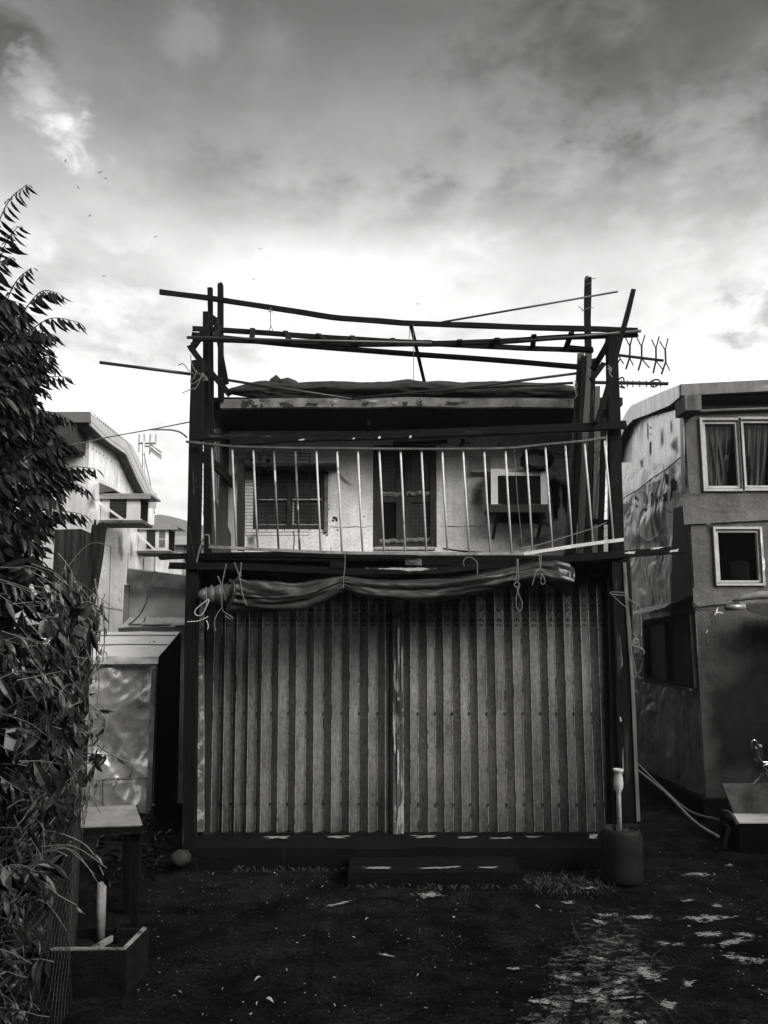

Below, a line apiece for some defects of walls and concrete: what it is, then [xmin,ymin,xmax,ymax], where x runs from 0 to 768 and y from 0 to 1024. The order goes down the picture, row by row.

peeling [394,627,403,695]